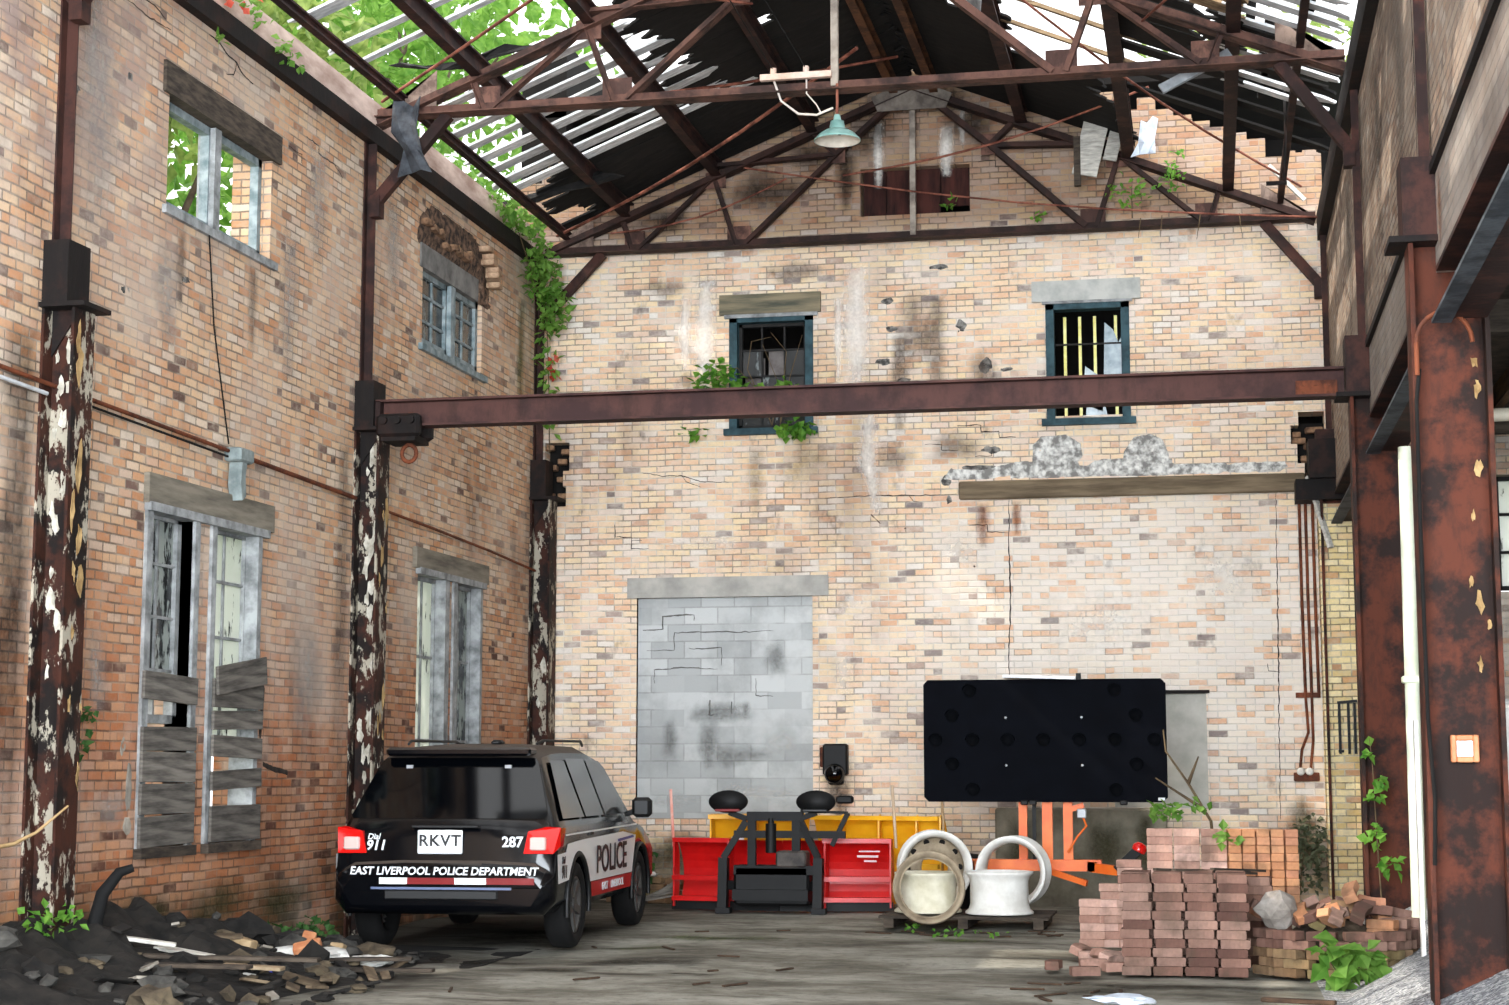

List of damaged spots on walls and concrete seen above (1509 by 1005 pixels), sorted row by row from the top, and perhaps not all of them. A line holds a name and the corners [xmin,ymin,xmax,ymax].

peeling [52,319,84,440]
peeling [49,438,84,598]
peeling [362,447,389,622]
flaking render [941,434,1288,504]
peeling [45,567,74,640]
crack [643,614,771,716]
peeling [356,661,386,807]